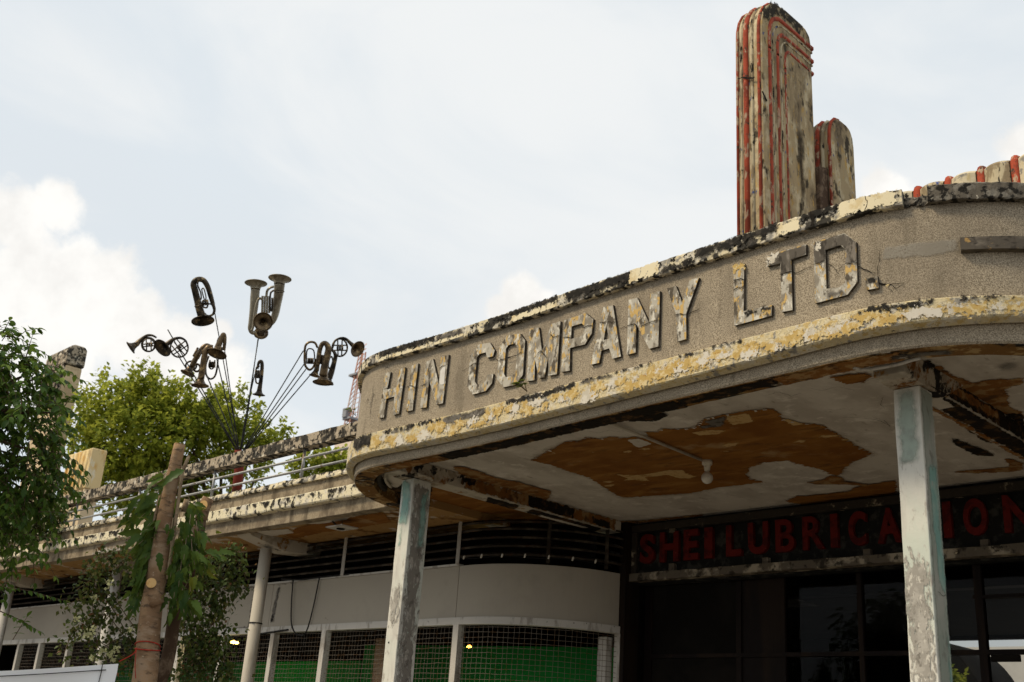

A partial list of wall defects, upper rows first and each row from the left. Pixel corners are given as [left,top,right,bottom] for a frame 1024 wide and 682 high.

peeling [837,189,899,217]
peeling [777,217,801,236]
peeling [628,261,659,284]
crack [780,252,901,292]
peeling [369,299,1024,449]
peeling [258,351,1024,682]